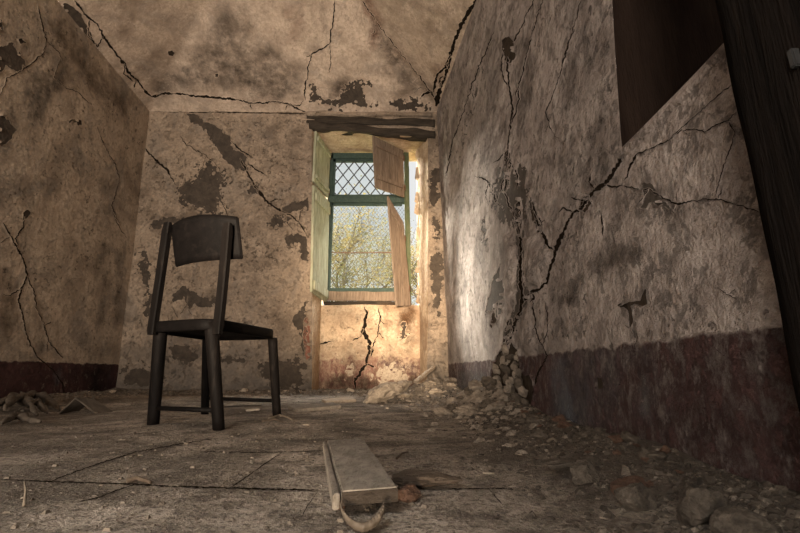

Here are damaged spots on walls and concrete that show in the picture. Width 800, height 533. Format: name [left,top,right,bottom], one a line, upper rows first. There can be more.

spalling [0,37,27,75]
crack [74,0,336,115]
peeling [308,78,432,112]
crack [361,0,476,107]
crack [1,216,65,393]
spalling [171,285,216,311]
spalling [148,110,250,231]
spalling [265,197,310,262]
crack [352,306,385,388]
spalling [414,150,445,318]
peeling [476,149,534,353]
crack [445,0,760,396]